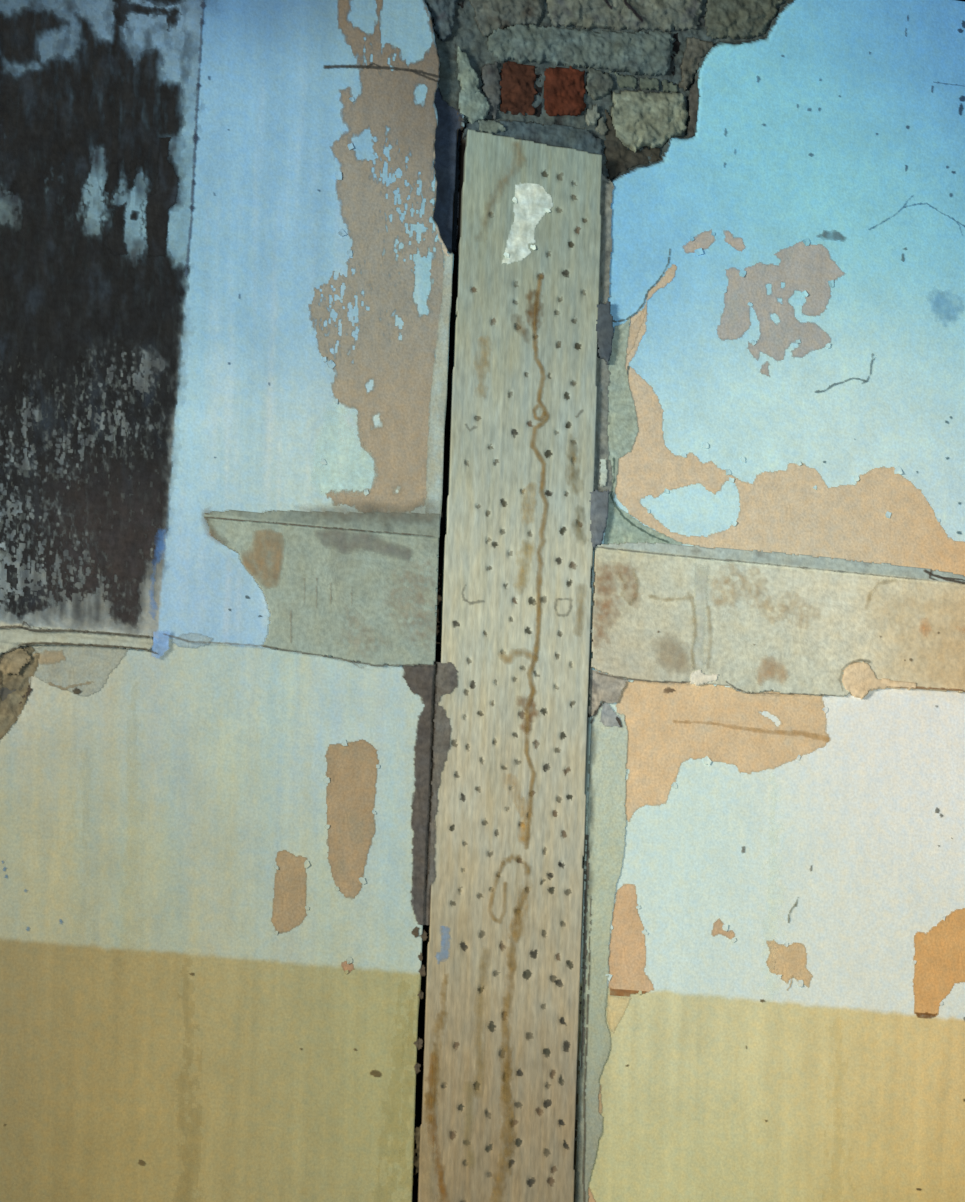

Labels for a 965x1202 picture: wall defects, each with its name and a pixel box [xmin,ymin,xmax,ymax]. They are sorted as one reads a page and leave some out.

spalling [309,0,795,516]
peeling [717,238,845,377]
peeling [599,264,965,576]
crack [815,353,874,393]
rust [508,275,548,873]
spalling [0,646,40,739]
peeling [271,850,310,935]
peeling [324,739,380,898]
peeling [605,884,654,1033]
peeling [587,669,829,822]
peeling [766,940,813,988]
peeling [912,908,965,1018]